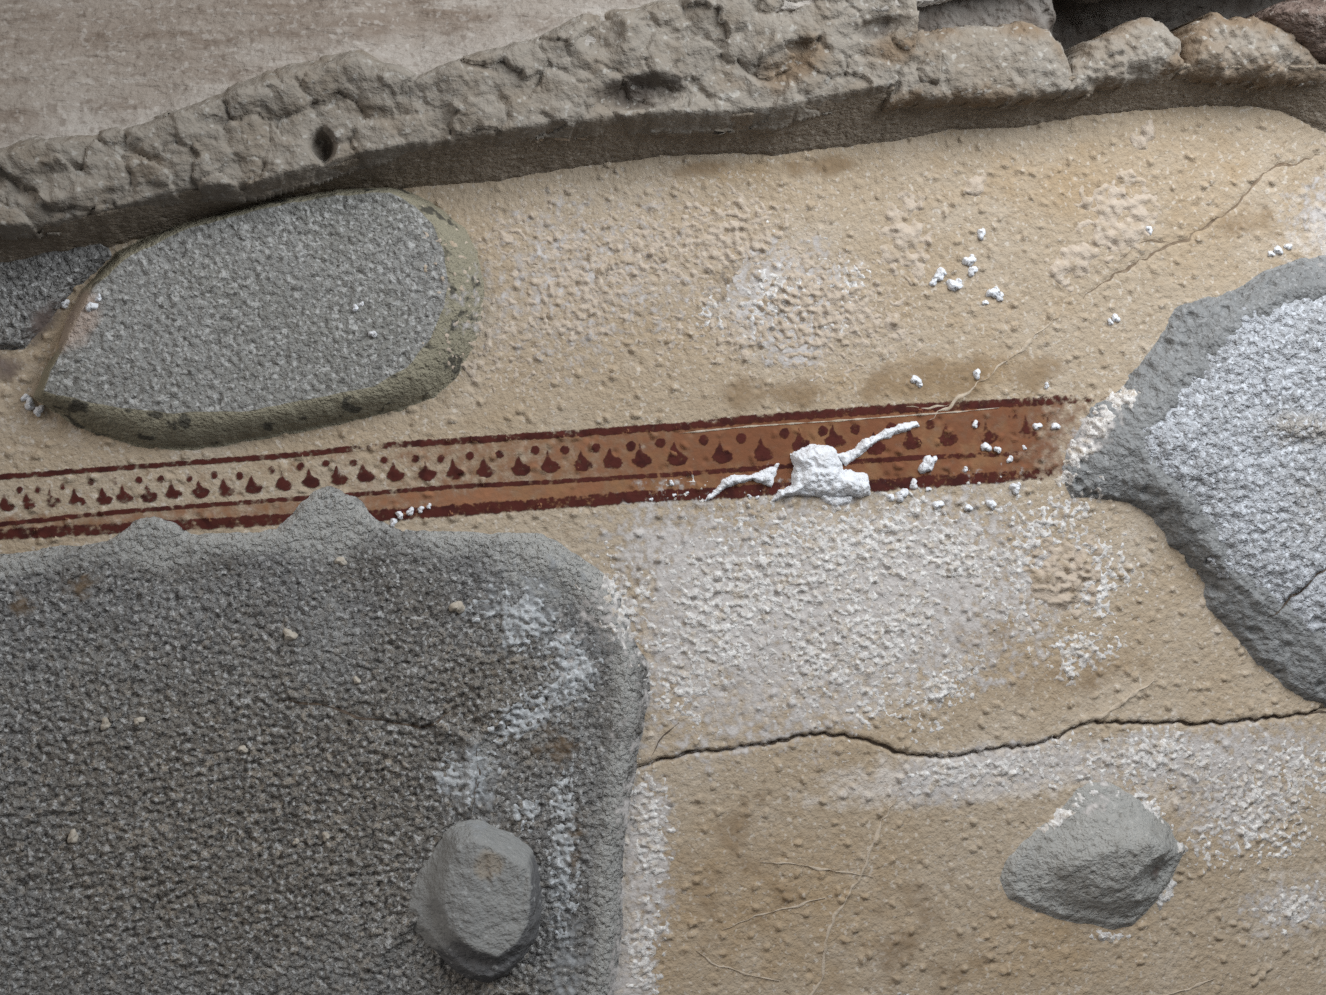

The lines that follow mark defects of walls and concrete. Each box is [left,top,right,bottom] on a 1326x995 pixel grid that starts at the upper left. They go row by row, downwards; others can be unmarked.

damp [422,155,979,410]
crack [906,154,1320,420]
damp [433,386,1326,995]
crack [637,680,1326,768]
crack [1268,569,1326,617]